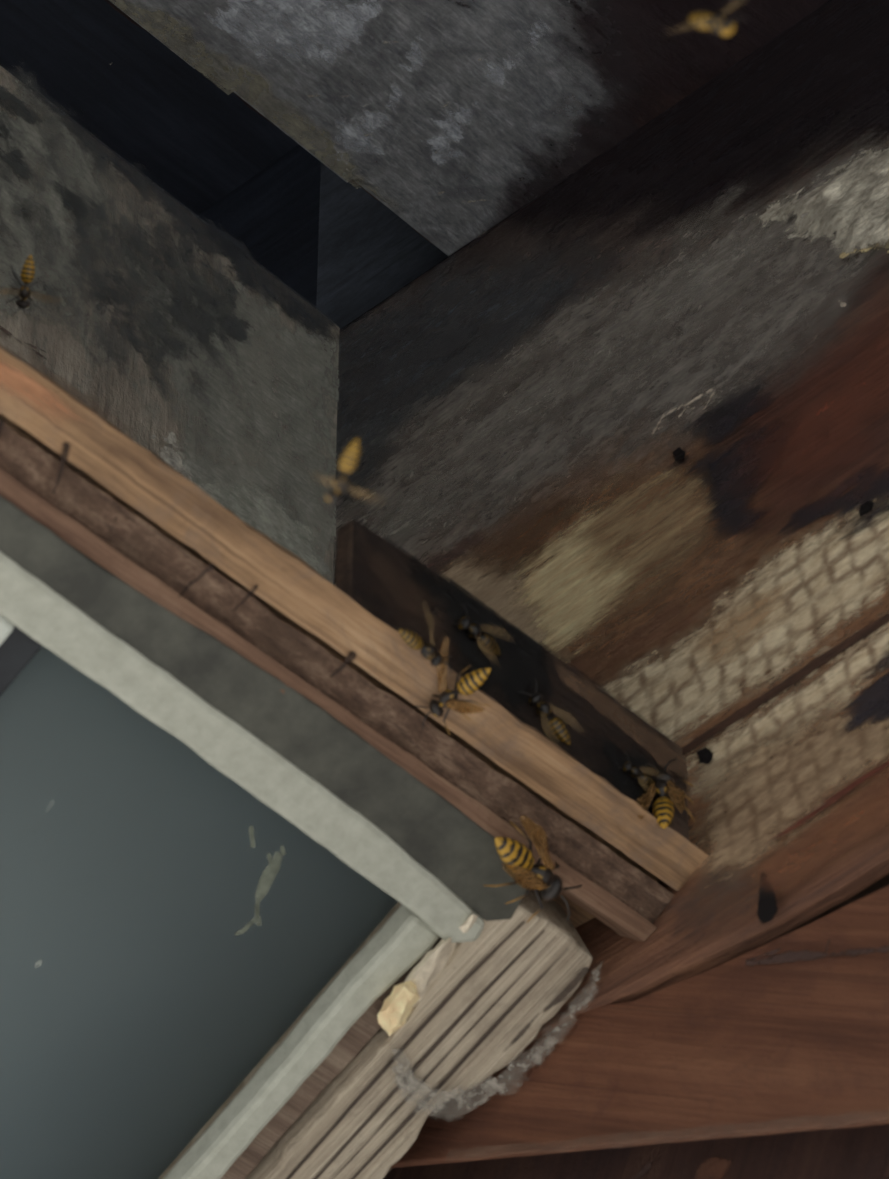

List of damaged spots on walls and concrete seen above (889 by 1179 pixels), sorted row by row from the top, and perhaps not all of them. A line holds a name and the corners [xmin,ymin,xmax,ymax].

peeling [760,204,786,221]
water stain [0,0,889,816]
water stain [670,579,889,900]